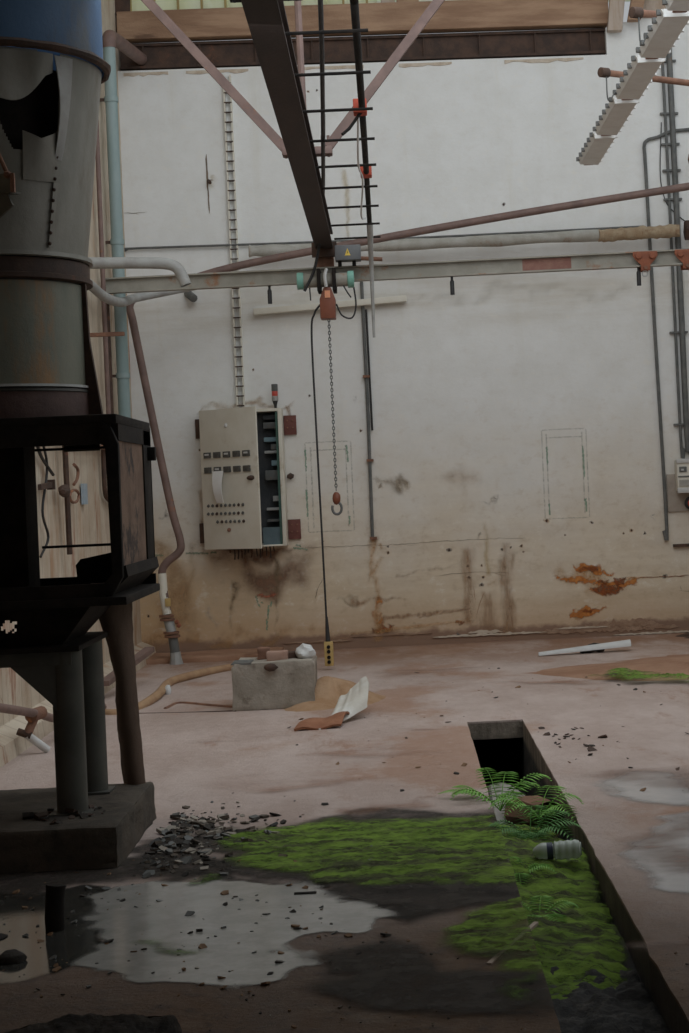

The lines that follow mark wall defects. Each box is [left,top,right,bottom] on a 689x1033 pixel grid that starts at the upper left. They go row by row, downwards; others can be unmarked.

rust [556,563,637,618]
water stain [307,808,497,841]
water stain [0,830,520,919]
water stain [313,941,554,1013]